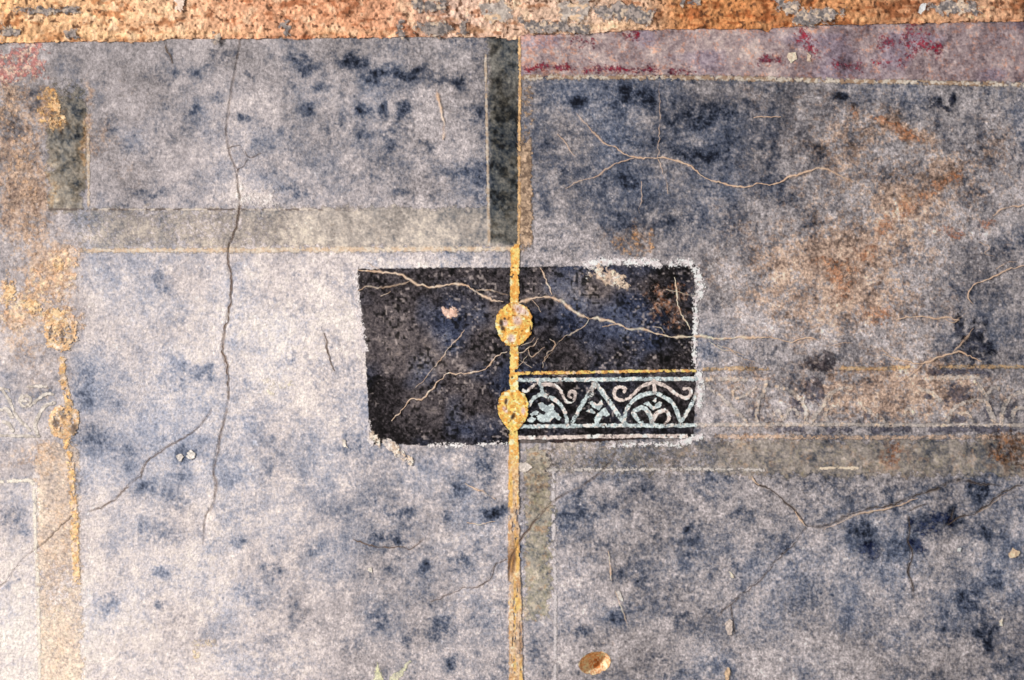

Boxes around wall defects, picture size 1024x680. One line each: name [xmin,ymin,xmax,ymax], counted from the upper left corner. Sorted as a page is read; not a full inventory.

spalling [0,0,1024,45]
peeling [0,80,86,332]
crack [575,129,850,200]
crack [98,145,253,509]
crack [357,264,846,421]
crack [879,242,1024,378]
crack [726,477,1022,632]